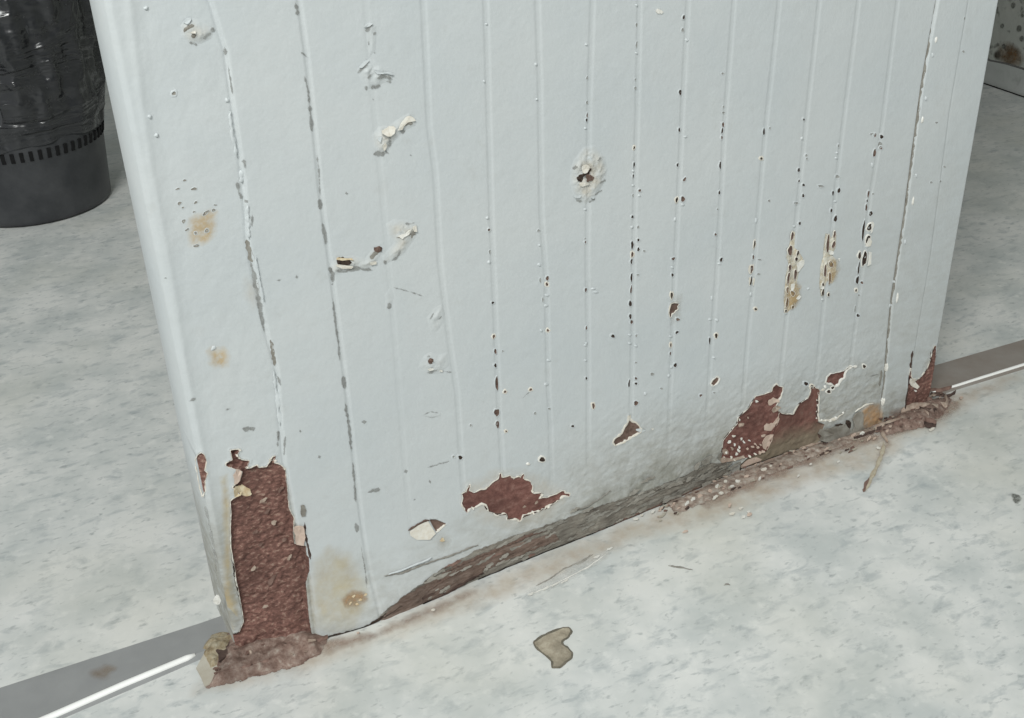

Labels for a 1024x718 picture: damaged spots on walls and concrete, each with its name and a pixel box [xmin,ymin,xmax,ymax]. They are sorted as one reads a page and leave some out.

rust [174,178,229,257]
peeling [574,164,590,210]
spalling [609,214,646,347]
spalling [659,291,681,390]
peeling [408,454,577,542]
rust [172,345,1024,711]
peeling [612,361,655,446]
peeling [633,363,889,522]
damp [862,442,886,492]